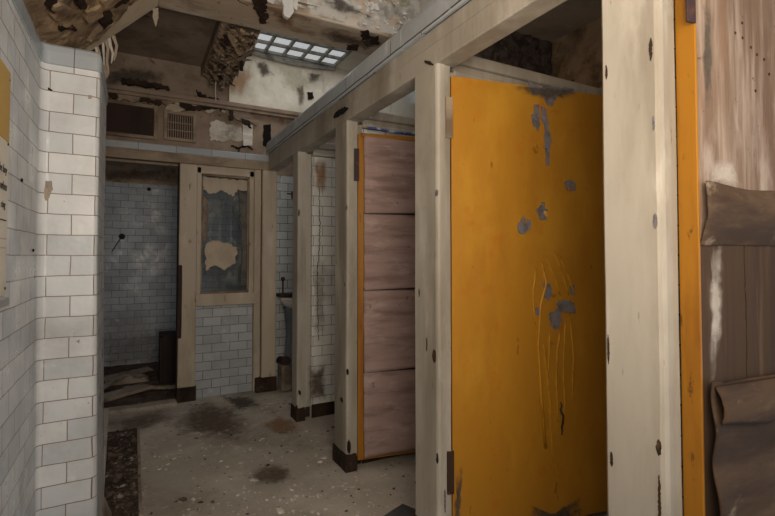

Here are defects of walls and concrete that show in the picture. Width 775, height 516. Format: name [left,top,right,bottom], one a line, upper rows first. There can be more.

spalling [23,0,138,50]
spalling [252,0,335,24]
peeling [346,0,410,51]
spalling [108,78,271,147]
peeling [202,176,249,286]
leakage [183,397,258,433]
leakage [255,466,288,481]